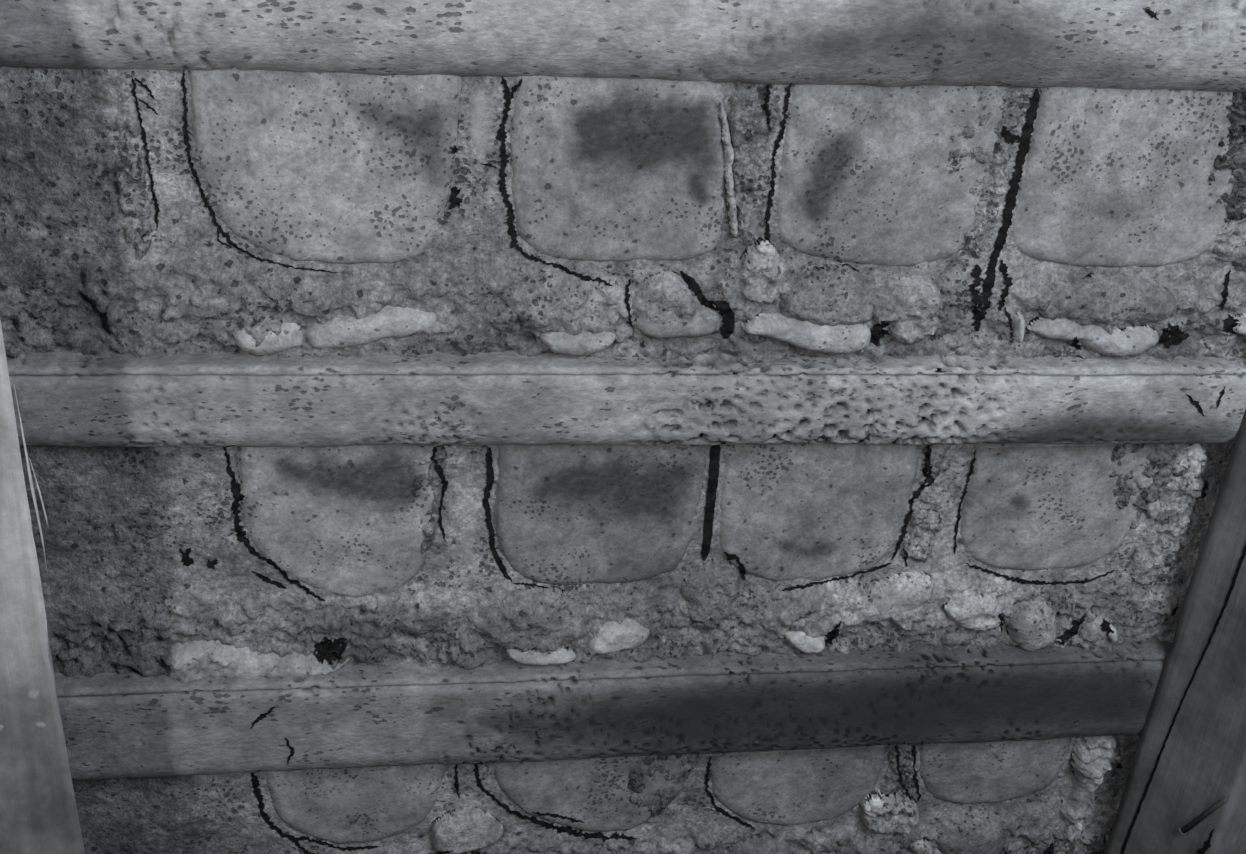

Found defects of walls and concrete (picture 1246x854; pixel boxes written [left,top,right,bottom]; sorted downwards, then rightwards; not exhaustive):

leakage [579,100,714,164]
leakage [806,138,850,217]
crack [1186,386,1226,416]
leakage [282,460,418,501]
leakage [542,457,685,522]
crack [1120,543,1246,854]